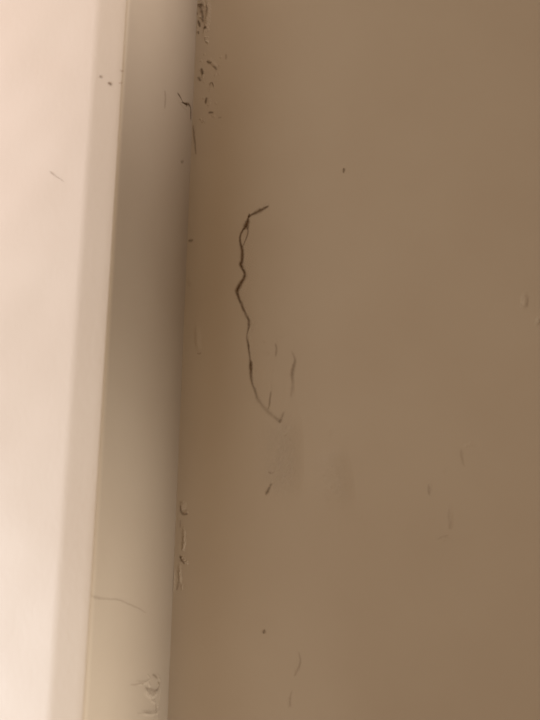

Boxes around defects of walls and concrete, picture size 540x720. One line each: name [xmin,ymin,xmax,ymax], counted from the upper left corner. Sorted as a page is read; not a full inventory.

crack [236,201,284,405]